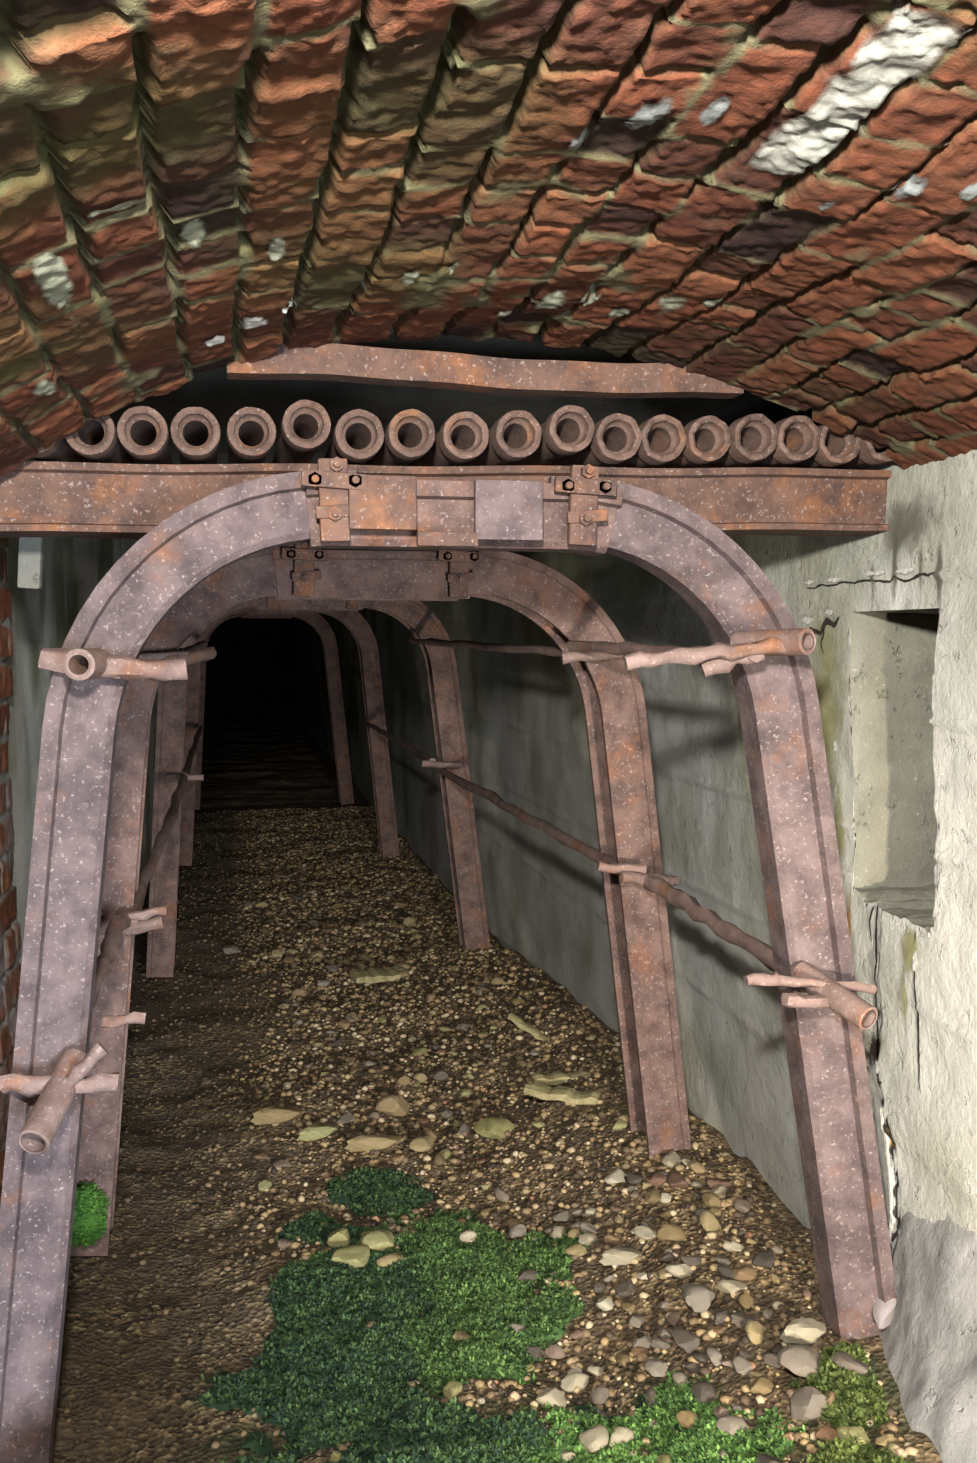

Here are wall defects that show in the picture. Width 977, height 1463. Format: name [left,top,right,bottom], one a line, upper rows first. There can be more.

damp [751,0,959,174]
damp [91,199,147,216]
damp [180,219,204,246]
damp [268,241,286,261]
damp [34,253,73,309]
damp [34,382,55,395]
crack [869,905,923,1242]